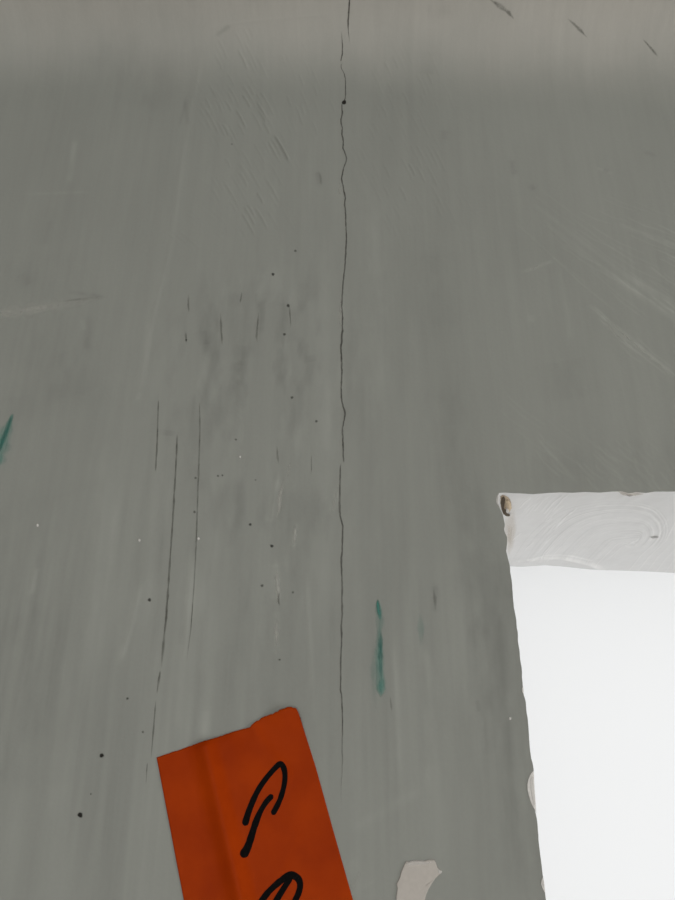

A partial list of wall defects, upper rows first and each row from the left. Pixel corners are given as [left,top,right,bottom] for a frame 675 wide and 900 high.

crack [339,0,350,493]
crack [337,516,345,574]
crack [337,613,345,736]